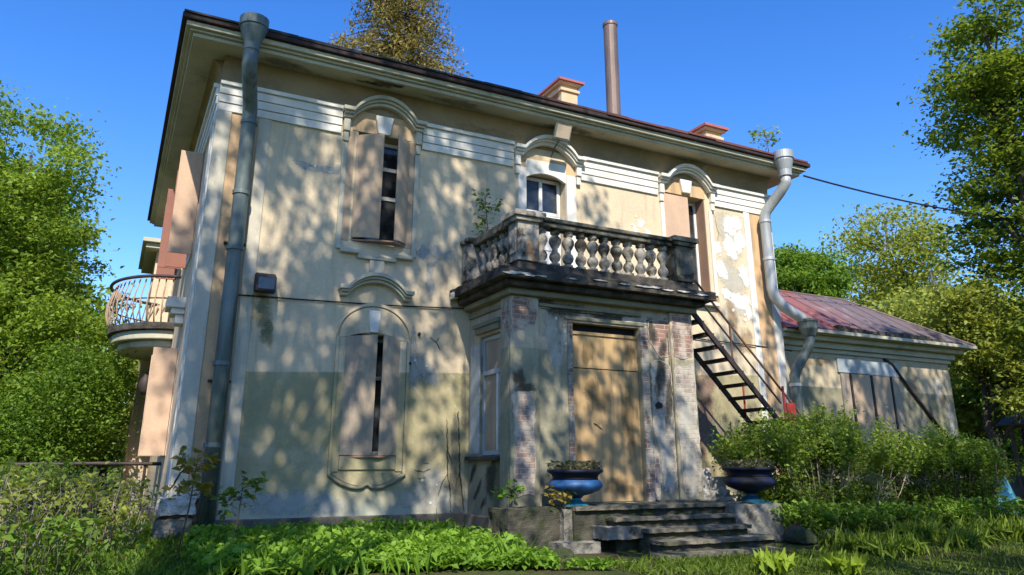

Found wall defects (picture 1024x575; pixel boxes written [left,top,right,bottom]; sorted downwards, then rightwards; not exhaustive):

spalling [504,270,547,278]
peeling [593,215,753,322]
flaking render [501,295,567,368]
flaking render [511,391,536,498]
flaking render [622,314,744,501]